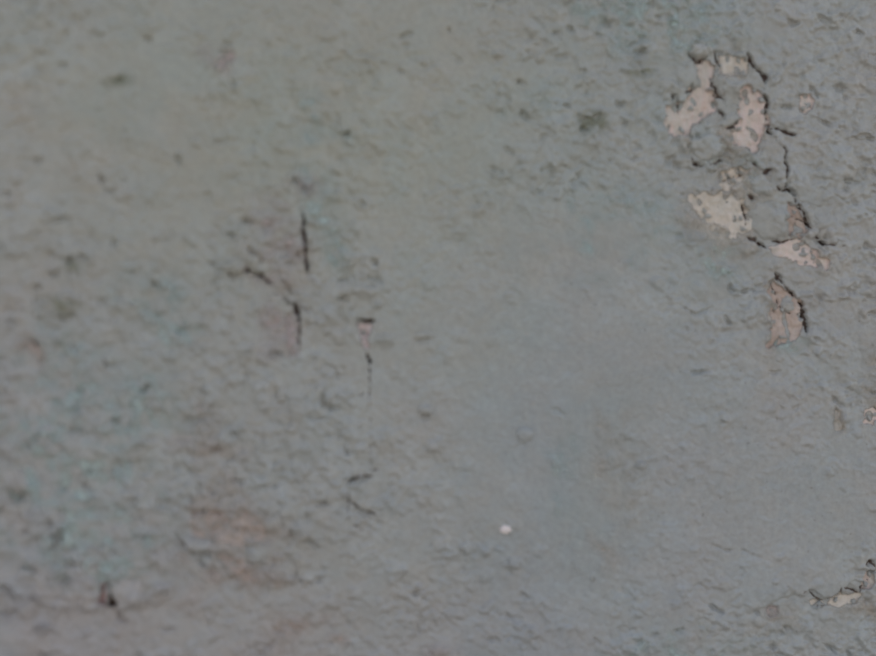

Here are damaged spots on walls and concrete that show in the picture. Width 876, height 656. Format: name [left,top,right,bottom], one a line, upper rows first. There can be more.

spalling [664,43,851,271]
crack [747,53,845,246]
crack [301,207,315,281]
spalling [765,282,803,349]
crack [774,273,807,336]